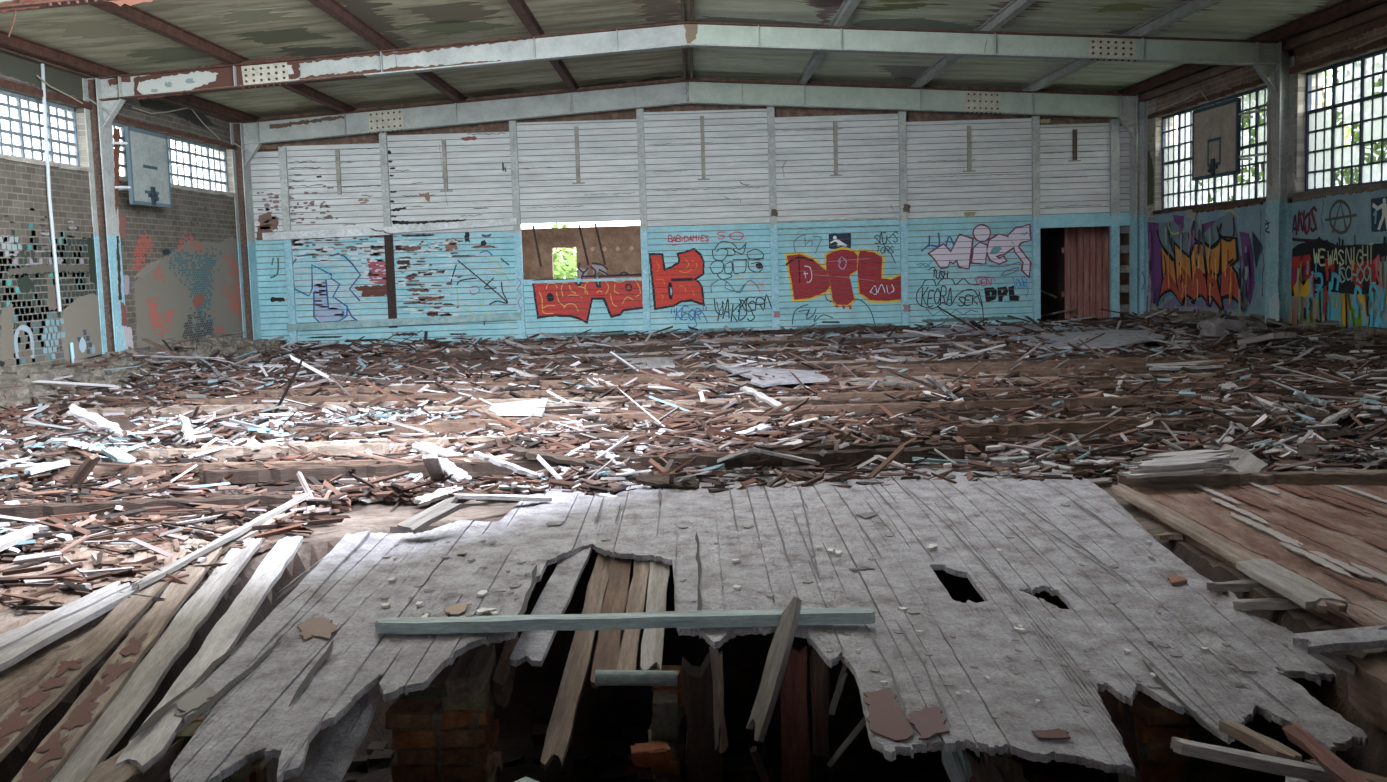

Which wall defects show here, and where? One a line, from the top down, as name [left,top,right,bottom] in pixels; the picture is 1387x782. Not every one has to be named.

peeling [256,185,527,321]